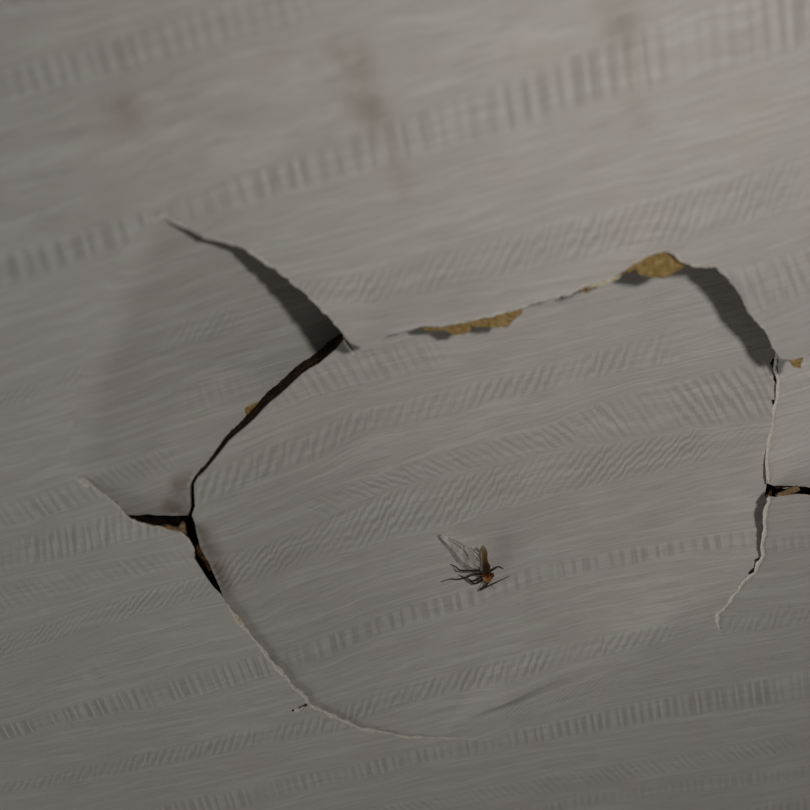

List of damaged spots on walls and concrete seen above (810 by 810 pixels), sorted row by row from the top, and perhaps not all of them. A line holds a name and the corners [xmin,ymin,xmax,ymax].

spalling [578,251,686,293]
spalling [423,308,523,335]
crack [83,333,343,595]